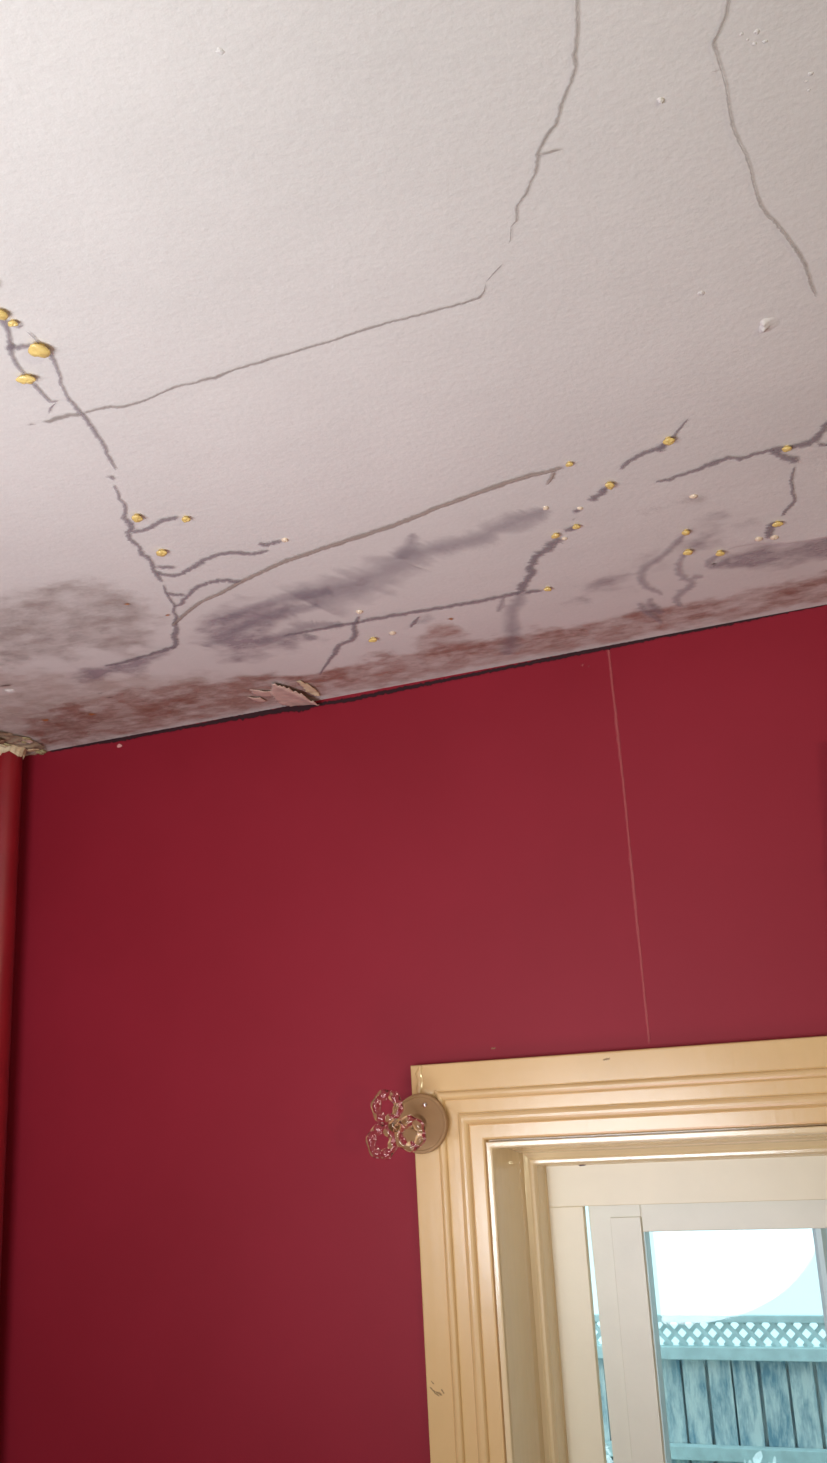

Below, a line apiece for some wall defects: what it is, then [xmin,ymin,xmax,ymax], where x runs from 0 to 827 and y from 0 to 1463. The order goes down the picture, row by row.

crack [712,0,815,294]
crack [0,0,577,666]
spalling [0,732,46,756]
peeling [248,680,321,707]
water stain [166,461,574,625]
crack [51,420,827,752]